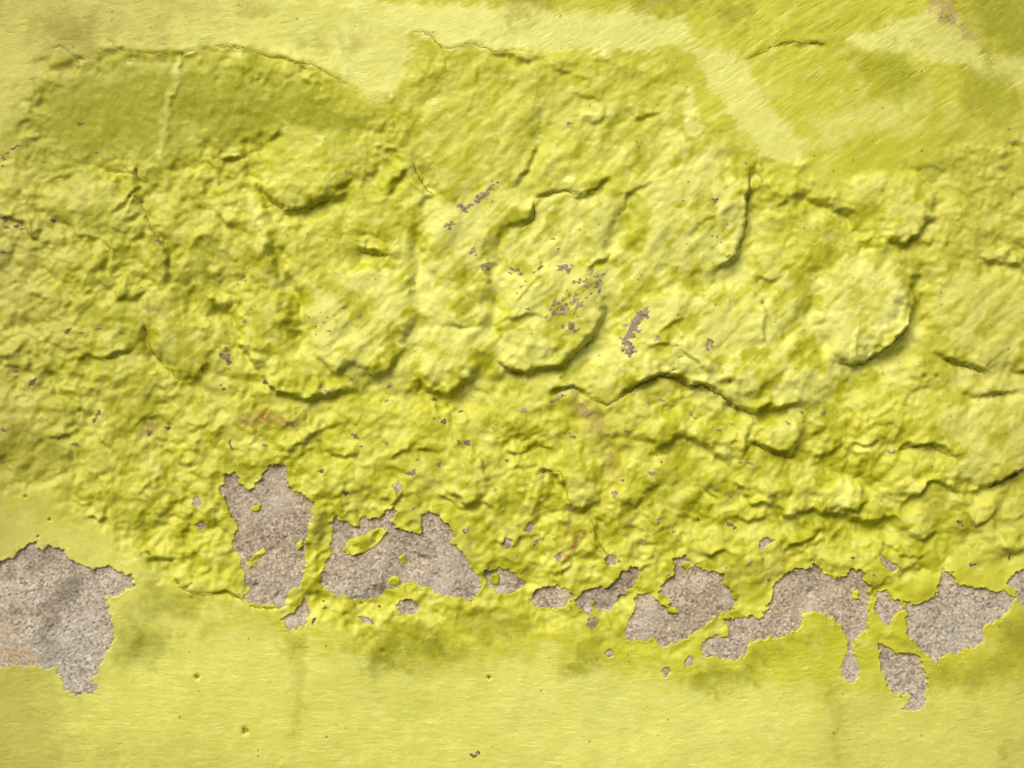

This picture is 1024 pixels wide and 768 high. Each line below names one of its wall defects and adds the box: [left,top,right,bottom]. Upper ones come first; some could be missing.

crack [107,162,169,271]
crack [550,369,765,415]
peeling [393,458,419,493]
peeling [0,541,135,696]
peeling [220,464,1024,711]